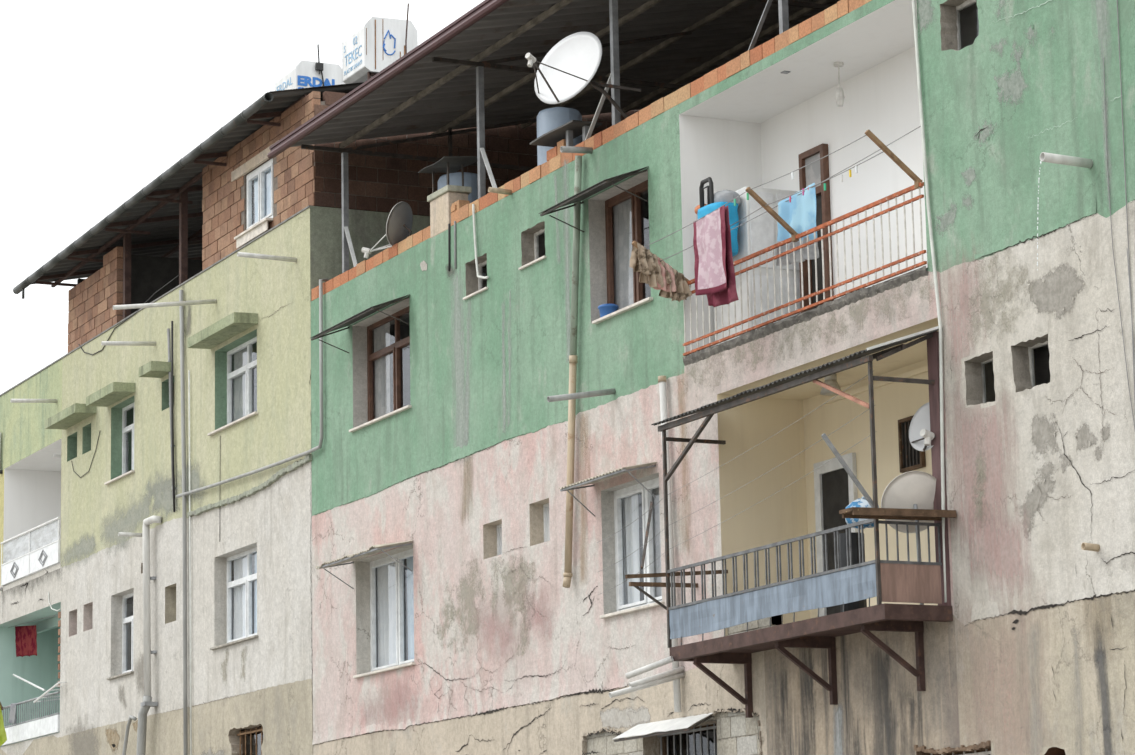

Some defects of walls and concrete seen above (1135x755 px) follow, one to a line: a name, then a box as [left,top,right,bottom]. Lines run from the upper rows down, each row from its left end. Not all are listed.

flaking render [1028,264,1085,319]
crack [964,308,1135,753]
flaking render [1021,415,1110,536]
crack [311,644,667,755]